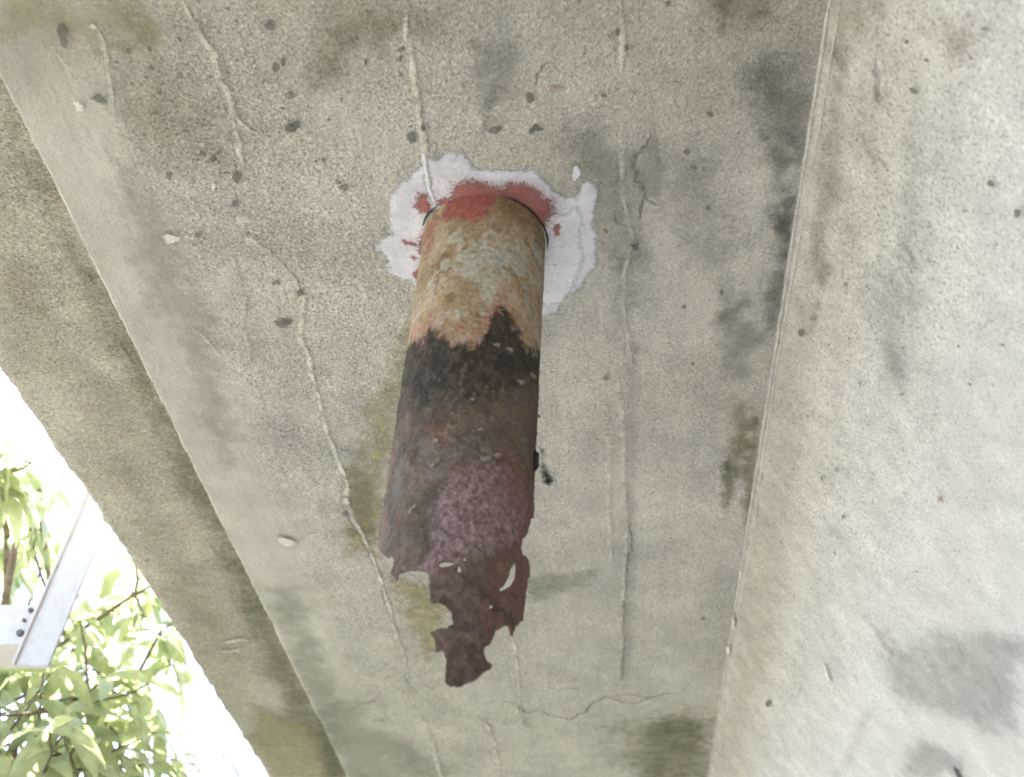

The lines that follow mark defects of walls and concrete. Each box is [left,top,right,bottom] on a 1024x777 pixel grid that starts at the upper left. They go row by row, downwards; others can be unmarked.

crack [617,135,655,224]